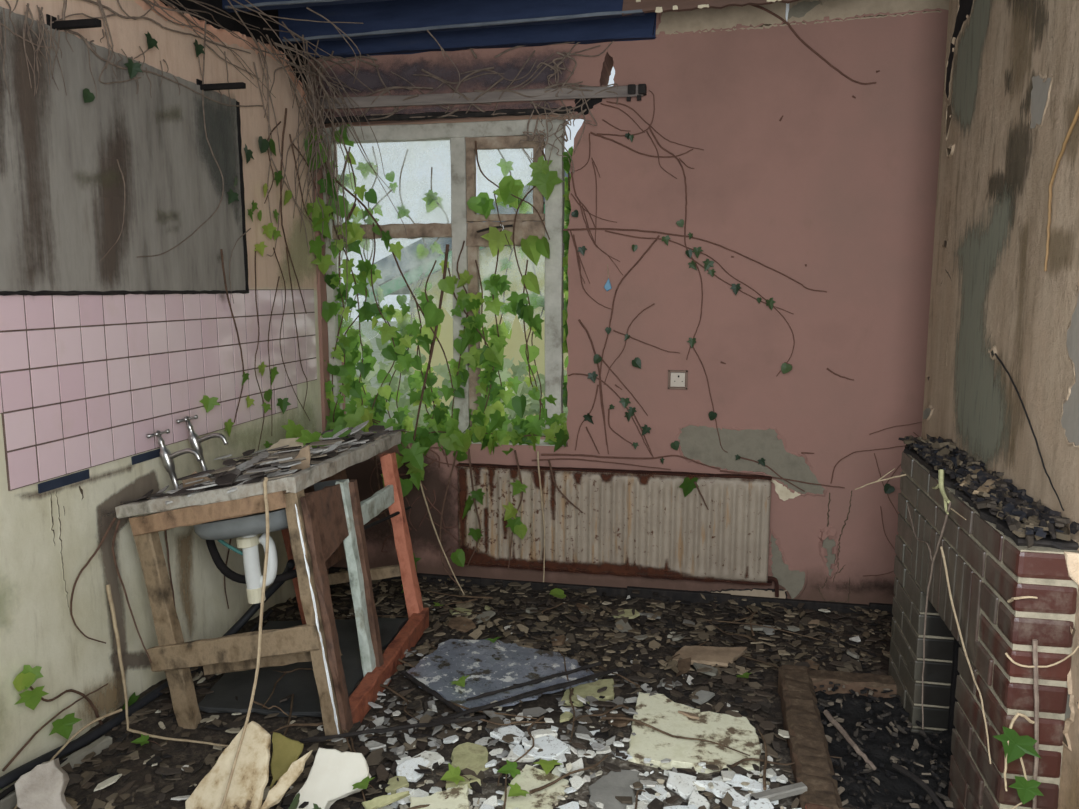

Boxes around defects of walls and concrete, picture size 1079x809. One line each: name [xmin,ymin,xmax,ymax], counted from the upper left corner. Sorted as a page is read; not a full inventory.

peeling [655,0,991,158]
leakage [989,75,1034,229]
leakage [1008,0,1049,47]
spalling [1058,283,1079,450]
spalling [675,422,828,502]
peeling [1062,668,1079,752]